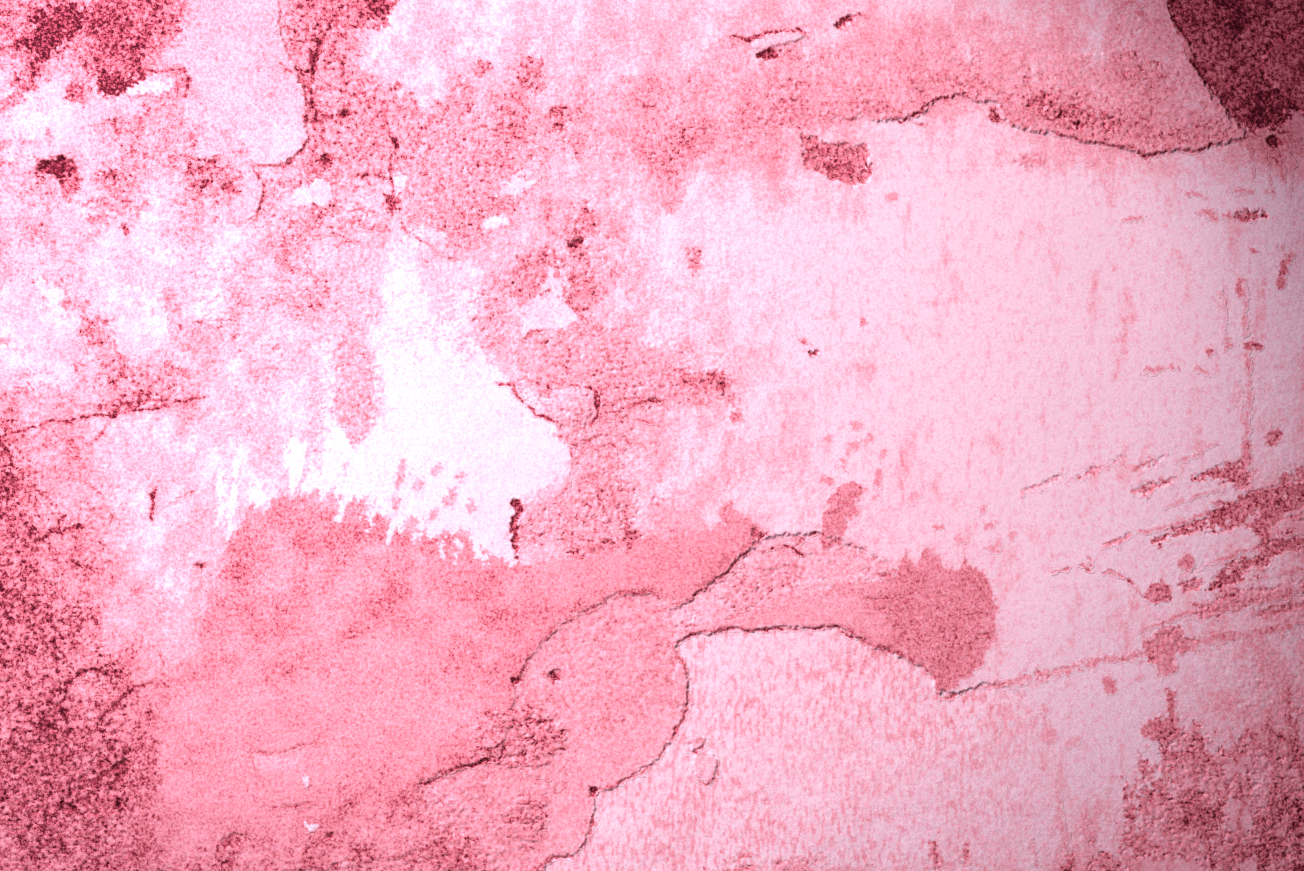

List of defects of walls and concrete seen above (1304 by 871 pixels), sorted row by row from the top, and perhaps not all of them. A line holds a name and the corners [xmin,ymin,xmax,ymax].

crack [248,37,458,279]
crack [729,26,811,62]
crack [876,17,1304,163]
spalling [1265,127,1293,149]
spalling [0,198,1304,871]
crack [412,526,966,871]
crack [965,610,996,641]